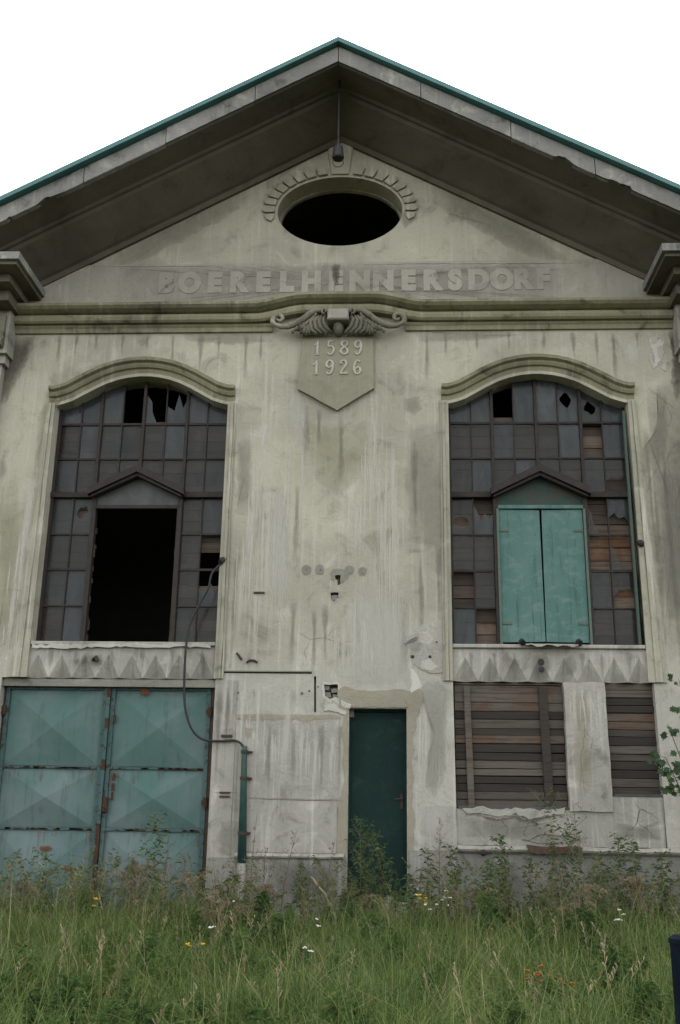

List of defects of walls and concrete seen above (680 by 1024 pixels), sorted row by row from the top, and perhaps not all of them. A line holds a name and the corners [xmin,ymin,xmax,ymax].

damp [2,342,30,393]
damp [671,338,680,385]
damp [335,601,423,692]
spalling [462,806,582,854]